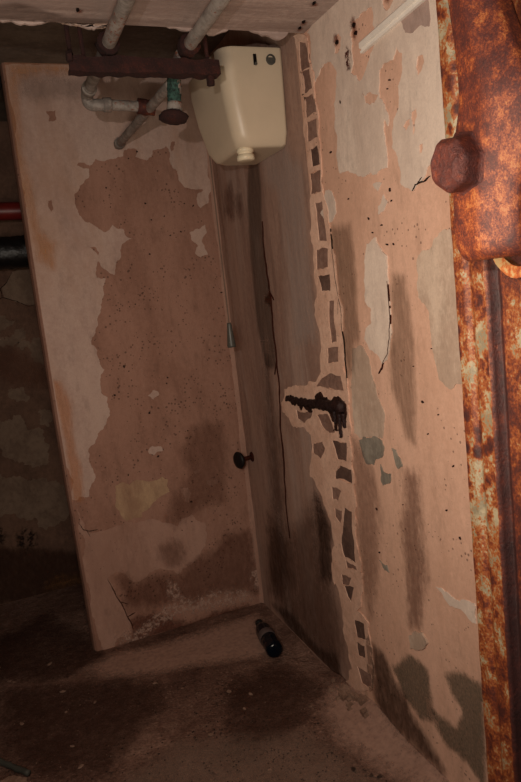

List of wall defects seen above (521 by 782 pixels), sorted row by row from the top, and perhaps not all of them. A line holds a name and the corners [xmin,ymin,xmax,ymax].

spalling [0,19,108,30]
peeling [0,64,211,500]
flaking render [250,0,445,692]
peeling [416,229,462,389]
crack [107,578,134,628]
damp [279,609,340,675]
peeling [436,587,477,624]
damp [373,649,484,782]